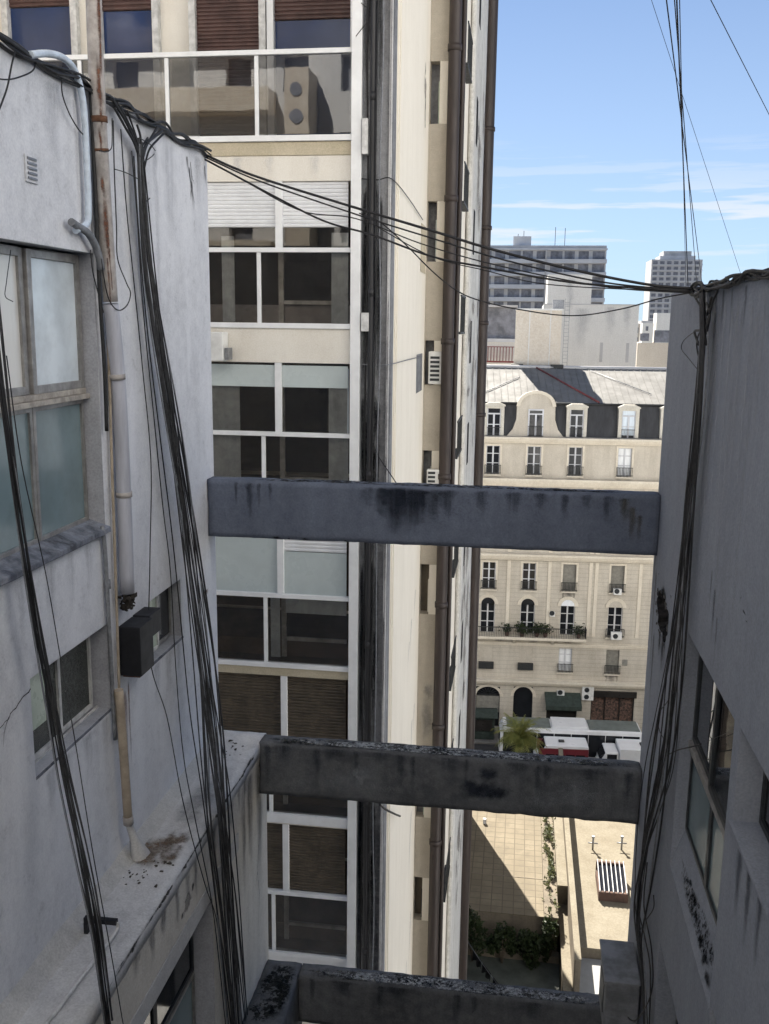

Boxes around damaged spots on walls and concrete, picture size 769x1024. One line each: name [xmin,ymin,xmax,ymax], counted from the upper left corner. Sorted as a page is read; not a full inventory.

corrosion [101,177,113,305]